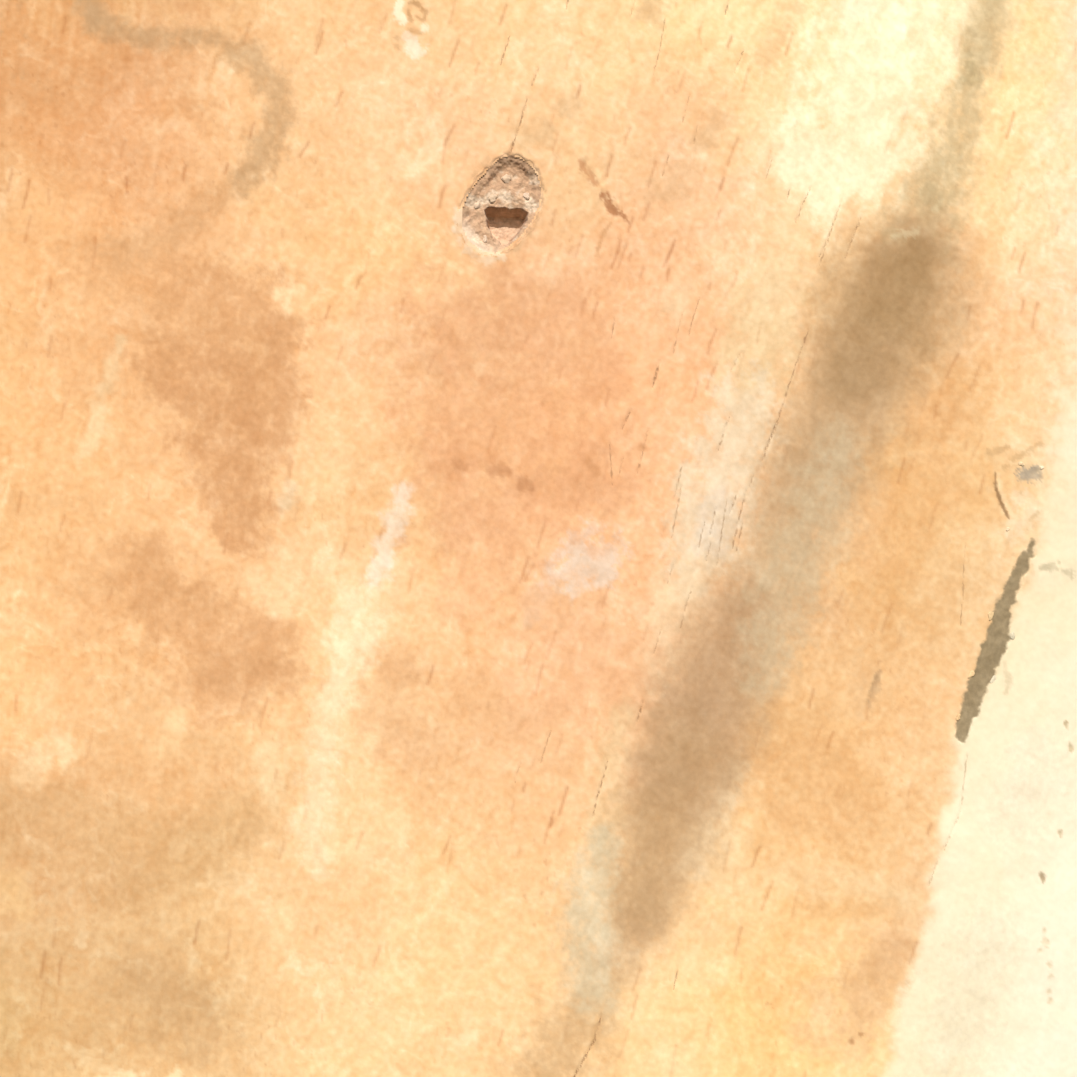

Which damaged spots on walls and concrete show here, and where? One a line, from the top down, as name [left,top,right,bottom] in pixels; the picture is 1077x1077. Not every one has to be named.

spalling [450,150,546,269]
damp [332,0,1077,1077]